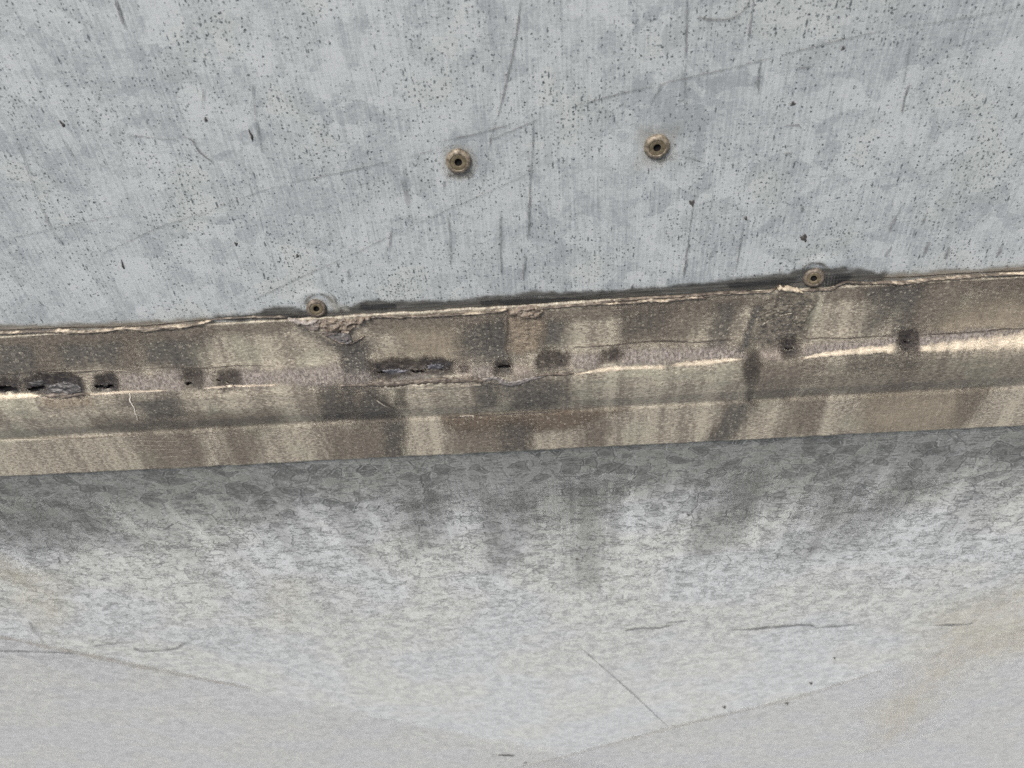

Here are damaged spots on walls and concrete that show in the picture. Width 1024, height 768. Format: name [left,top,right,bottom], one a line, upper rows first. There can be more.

peeling [0,272,1024,355]
peeling [340,364,574,388]
peeling [28,380,90,399]